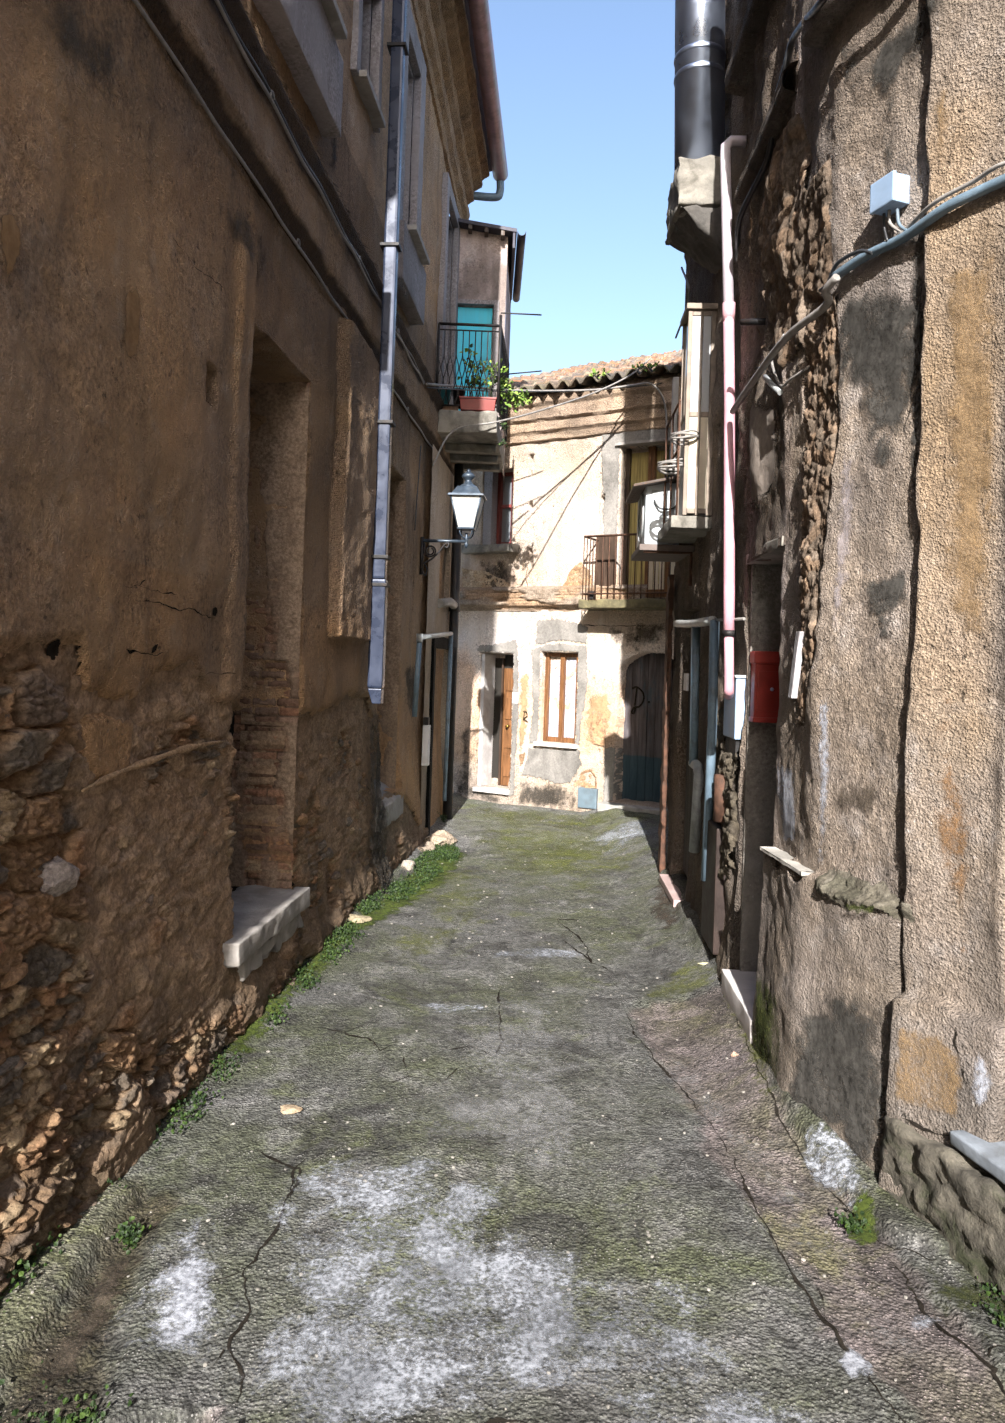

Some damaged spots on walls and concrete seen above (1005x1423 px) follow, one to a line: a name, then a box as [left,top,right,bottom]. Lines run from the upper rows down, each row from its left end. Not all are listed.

spalling [748,113,841,726]
water stain [31,1257,131,1397]
water stain [151,1235,214,1353]
spalling [0,639,429,1294]
crack [152,1149,305,1414]
water stain [260,1159,733,1423]
crack [485,1415,526,1423]
water stain [705,1393,811,1423]
crack [628,1017,1005,1423]
water stain [791,997,883,1189]